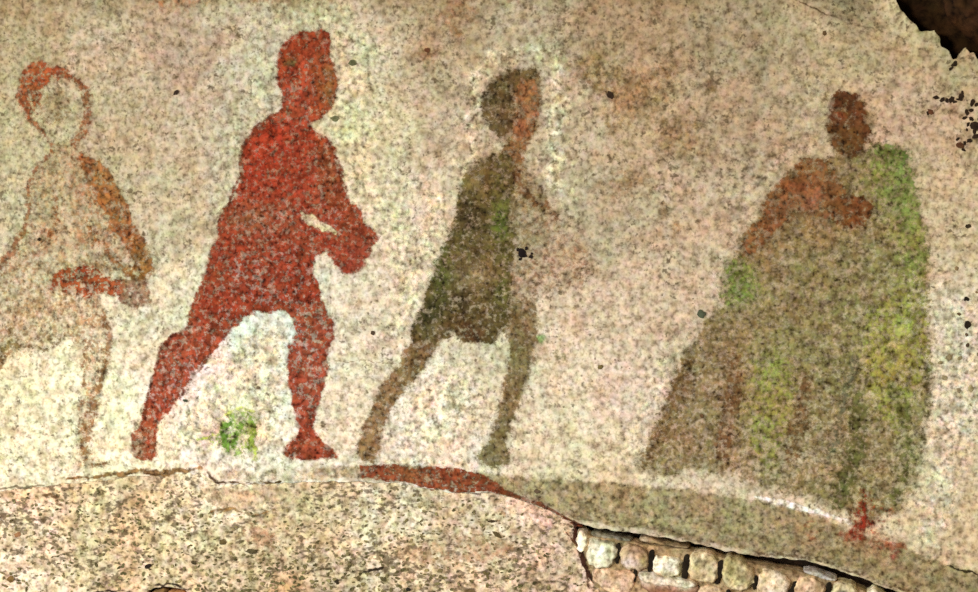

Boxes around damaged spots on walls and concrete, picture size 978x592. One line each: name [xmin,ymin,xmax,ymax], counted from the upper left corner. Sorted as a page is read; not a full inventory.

flaking render [896,0,978,71]
leakage [184,335,276,454]
crack [0,466,273,506]
crack [211,507,276,515]
peeling [529,507,557,530]
crack [96,583,188,592]
crack [545,522,594,592]
flaking render [565,524,896,592]
crack [947,565,978,576]